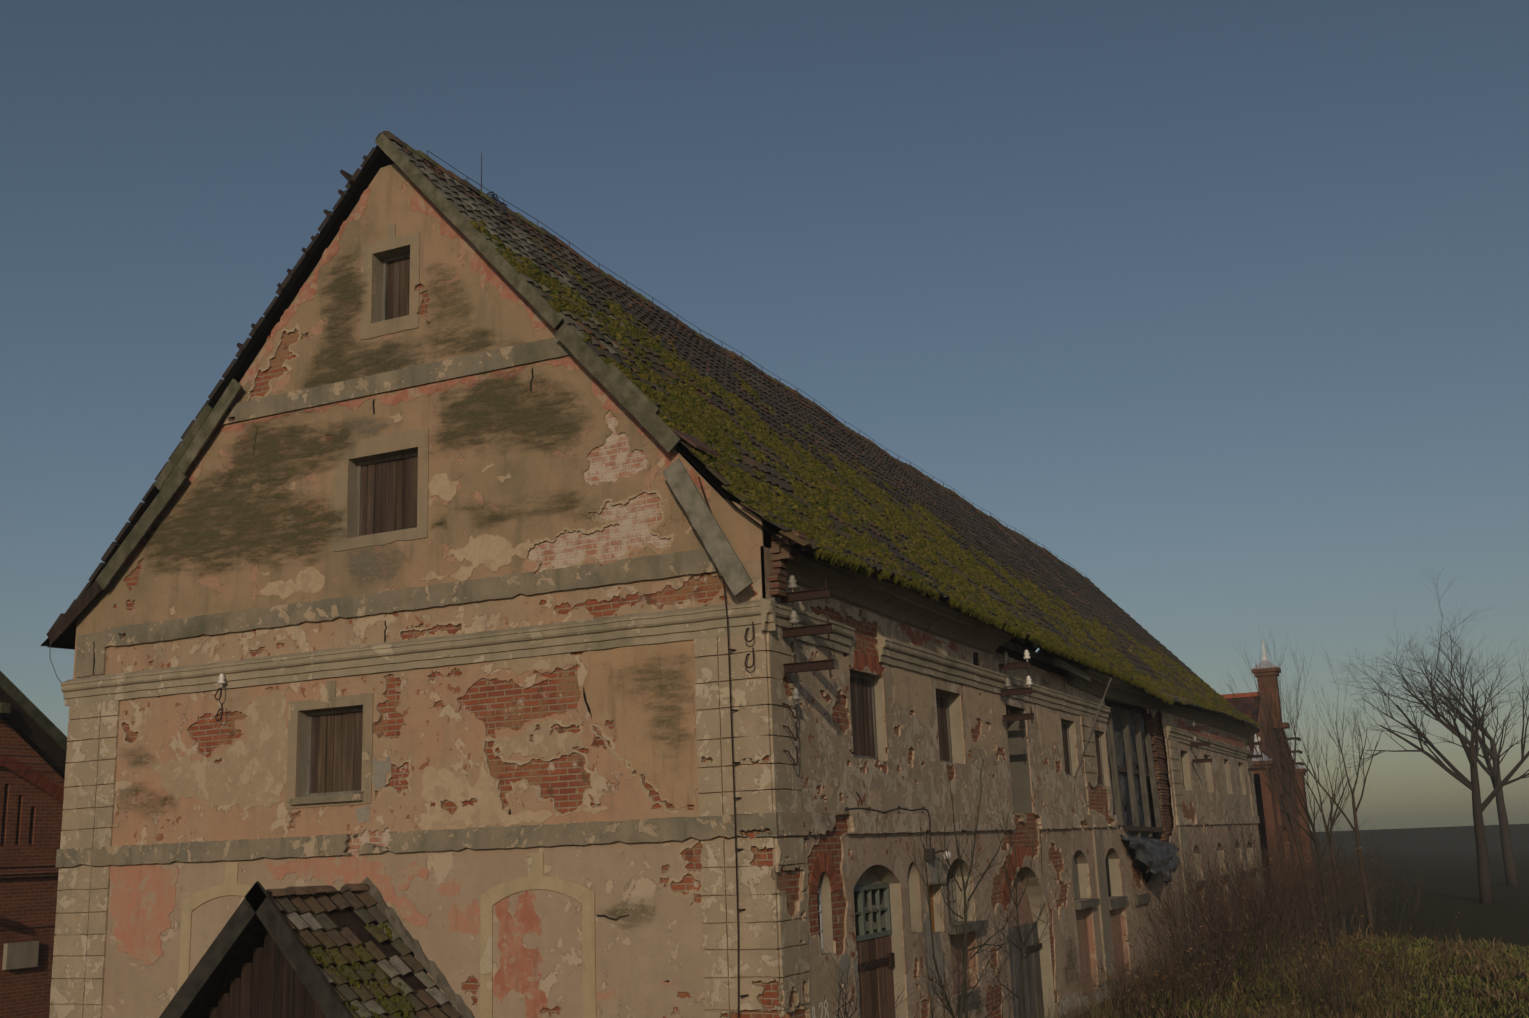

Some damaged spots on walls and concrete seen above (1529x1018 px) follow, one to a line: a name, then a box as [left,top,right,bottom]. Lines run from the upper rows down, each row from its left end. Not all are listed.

spalling [115,184,705,611]
spalling [188,711,247,763]
spalling [398,620,465,641]
peeling [363,640,713,830]
spalling [540,573,727,619]
peeling [782,601,934,783]
peeling [962,684,1007,778]
peeling [265,828,562,1018]
spalling [661,840,706,904]
spalling [723,980,825,1018]
spalling [726,786,850,959]
spalling [990,704,1069,1007]